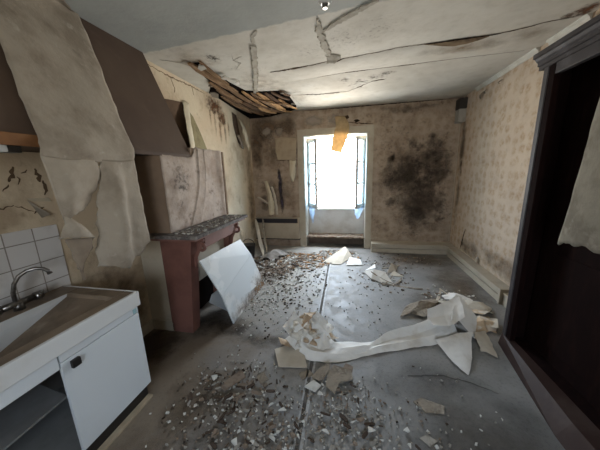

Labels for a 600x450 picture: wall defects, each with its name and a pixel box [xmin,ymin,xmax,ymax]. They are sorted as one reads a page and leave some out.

crack [270,17,571,124]
peeling [58,216,95,239]